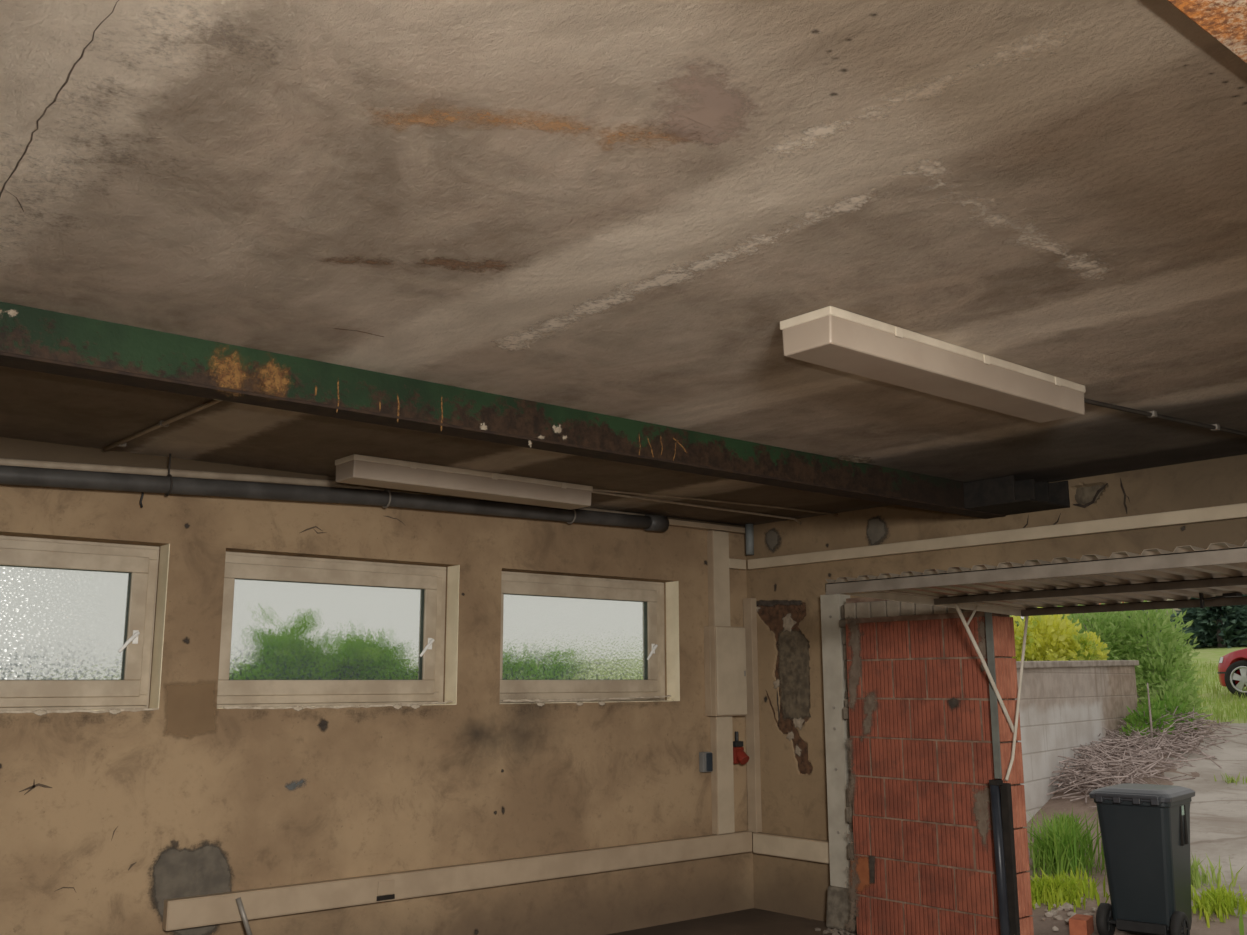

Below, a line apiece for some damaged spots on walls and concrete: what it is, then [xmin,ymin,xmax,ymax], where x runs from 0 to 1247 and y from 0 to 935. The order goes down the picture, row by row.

crack [0,0,119,212]
rust [421,257,507,272]
rust [209,347,289,396]
flaking render [756,584,813,775]